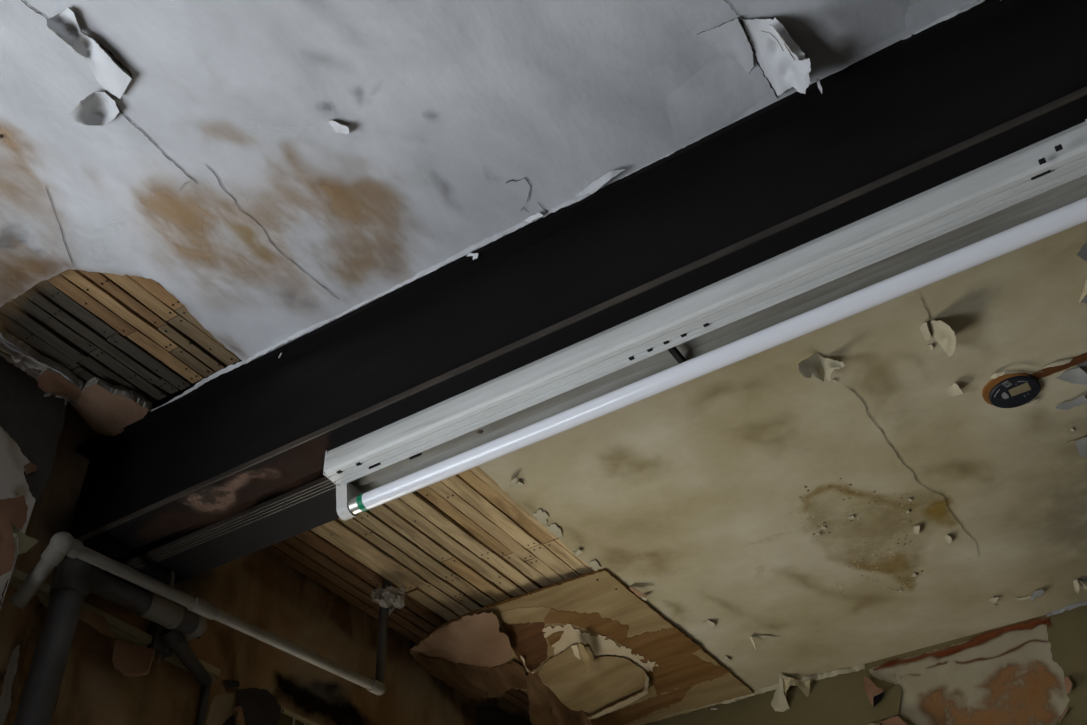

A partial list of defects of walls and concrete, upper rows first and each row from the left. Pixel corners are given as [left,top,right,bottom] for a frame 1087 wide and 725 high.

peeling [47,7,132,126]
crack [96,41,134,79]
crack [699,0,778,99]
peeling [697,17,822,96]
water stain [0,126,19,152]
water stain [140,188,216,260]
crack [117,106,335,297]
water stain [319,184,389,223]
flaking render [0,356,150,506]
corrosion [188,470,276,511]
crack [847,387,979,557]
flaking render [869,618,1070,725]